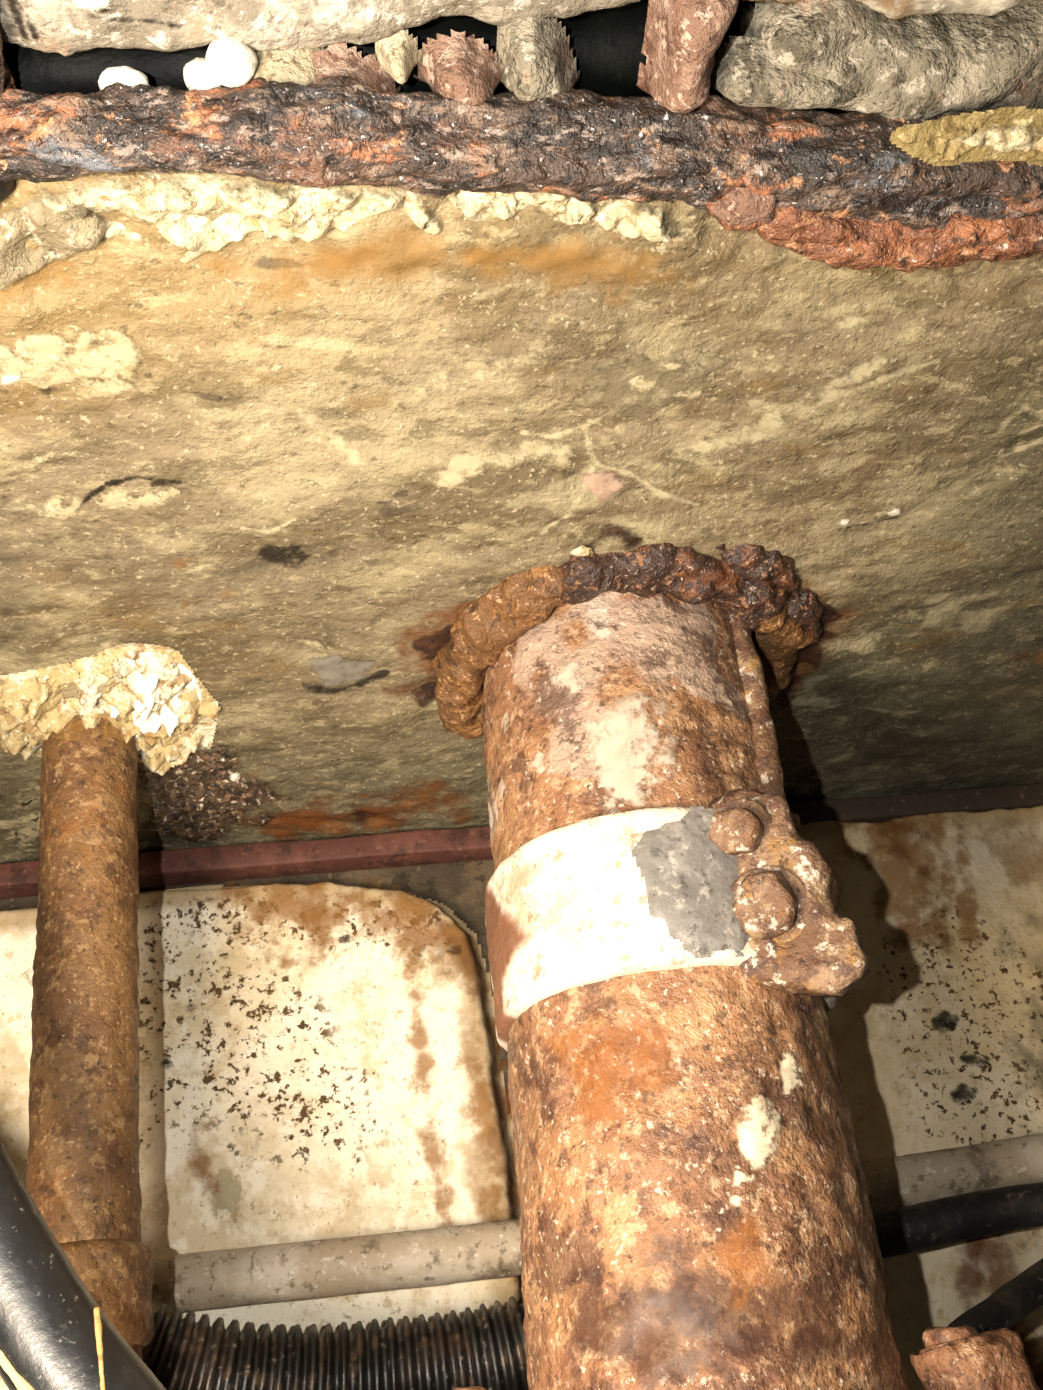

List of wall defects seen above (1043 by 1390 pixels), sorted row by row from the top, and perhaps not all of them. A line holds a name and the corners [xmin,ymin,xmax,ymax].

spalling [0,32,1043,274]
water stain [0,643,221,776]
rust [242,781,463,839]
rust [407,525,848,739]